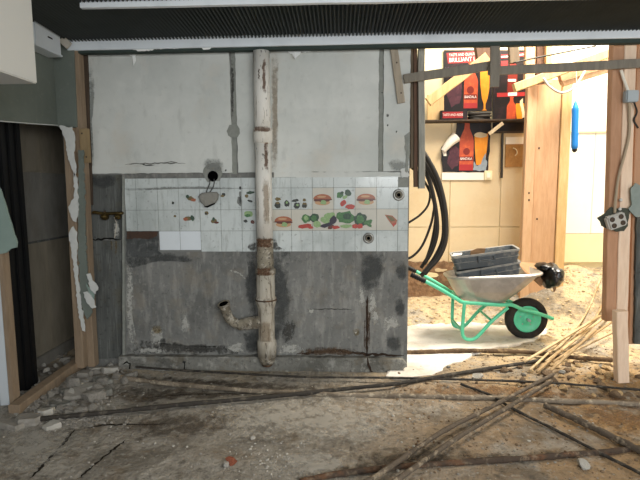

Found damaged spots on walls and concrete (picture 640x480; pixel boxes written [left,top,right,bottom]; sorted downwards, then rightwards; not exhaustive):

crack [125,159,185,167]
peeling [59,125,99,331]
damp [359,257,404,331]
crack [309,296,373,372]
damp [388,338,400,349]
crack [30,423,165,479]